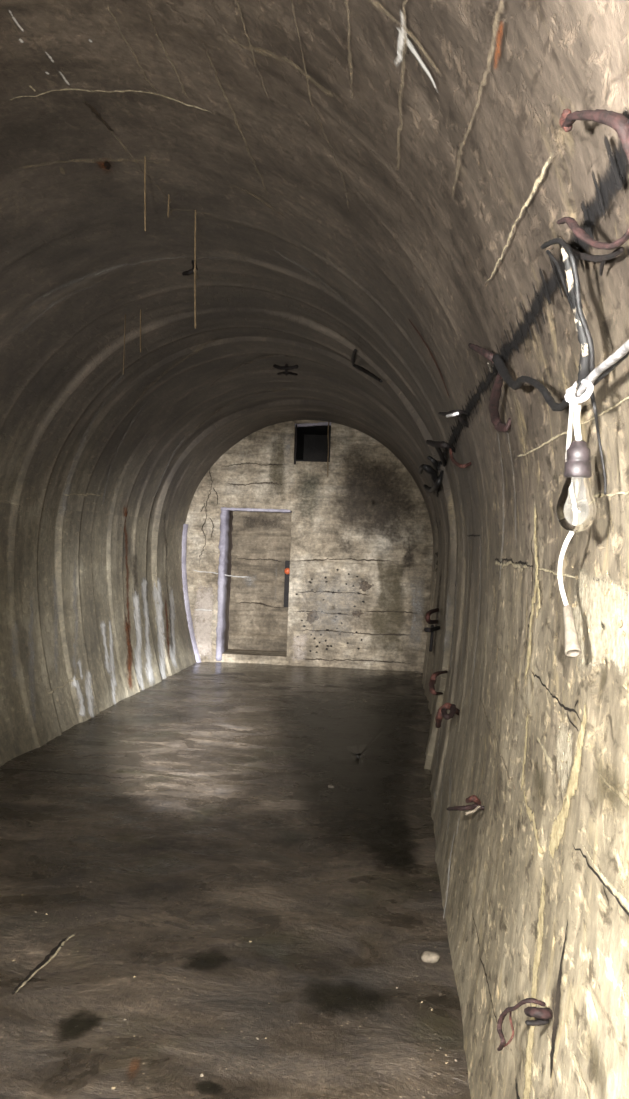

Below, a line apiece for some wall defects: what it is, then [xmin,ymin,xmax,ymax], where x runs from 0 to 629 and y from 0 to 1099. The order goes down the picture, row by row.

water stain [338,457,411,538]
rust [124,508,133,687]
water stain [372,548,422,647]
crack [494,540,580,731]
crack [573,845,629,916]
crack [550,920,568,1078]